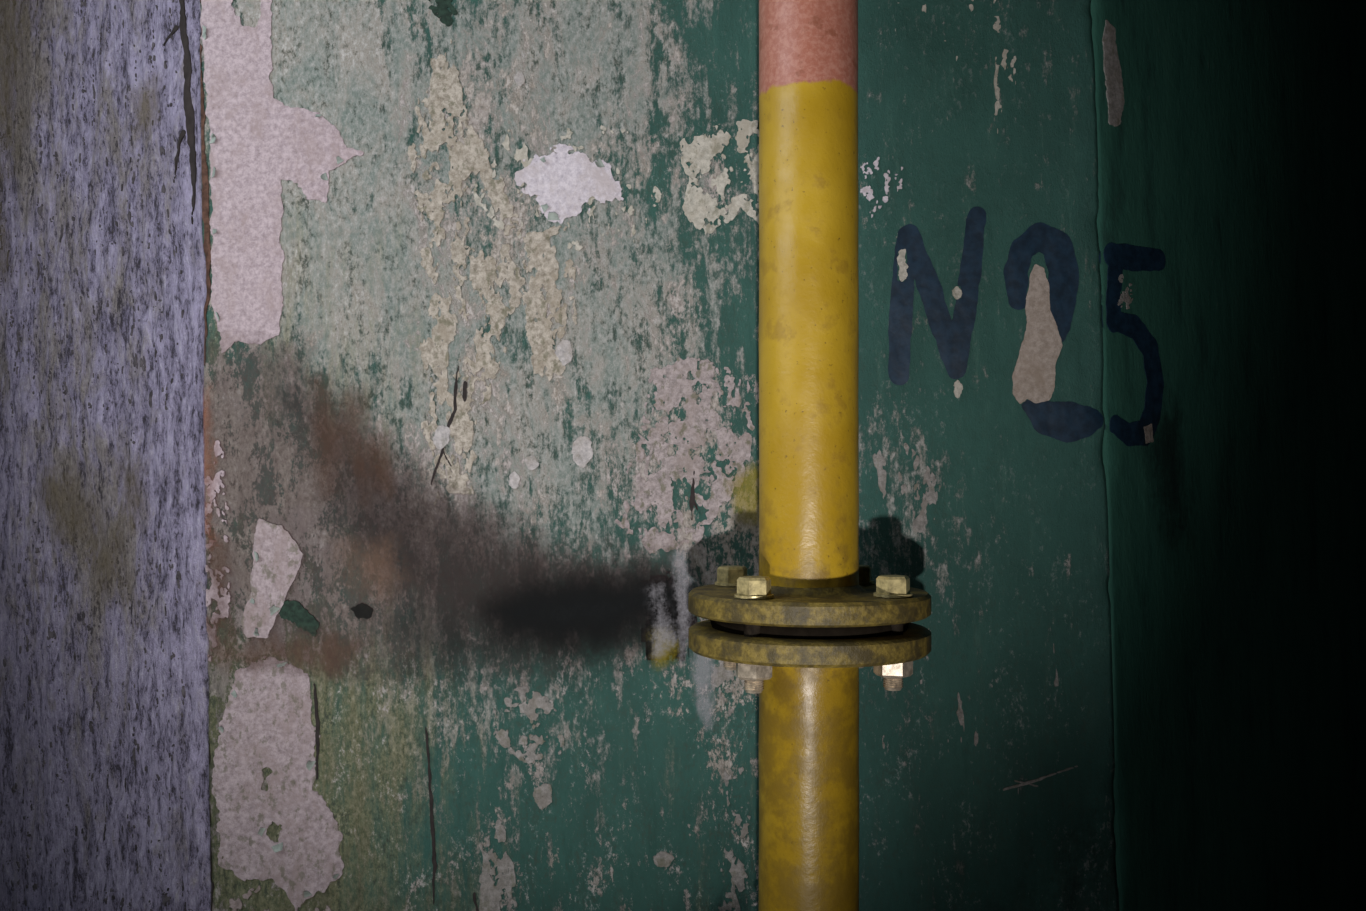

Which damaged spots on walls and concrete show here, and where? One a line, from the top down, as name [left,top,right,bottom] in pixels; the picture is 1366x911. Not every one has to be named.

spalling [1102,20,1125,127]
peeling [200,0,364,353]
peeling [680,119,759,235]
peeling [408,39,662,506]
peeling [1012,264,1063,404]
peeling [615,357,755,554]
peeling [204,440,305,661]
peeling [212,656,344,911]
peeling [479,819,517,911]
peeling [493,686,565,764]
peeling [533,783,552,810]
peeling [718,739,751,911]